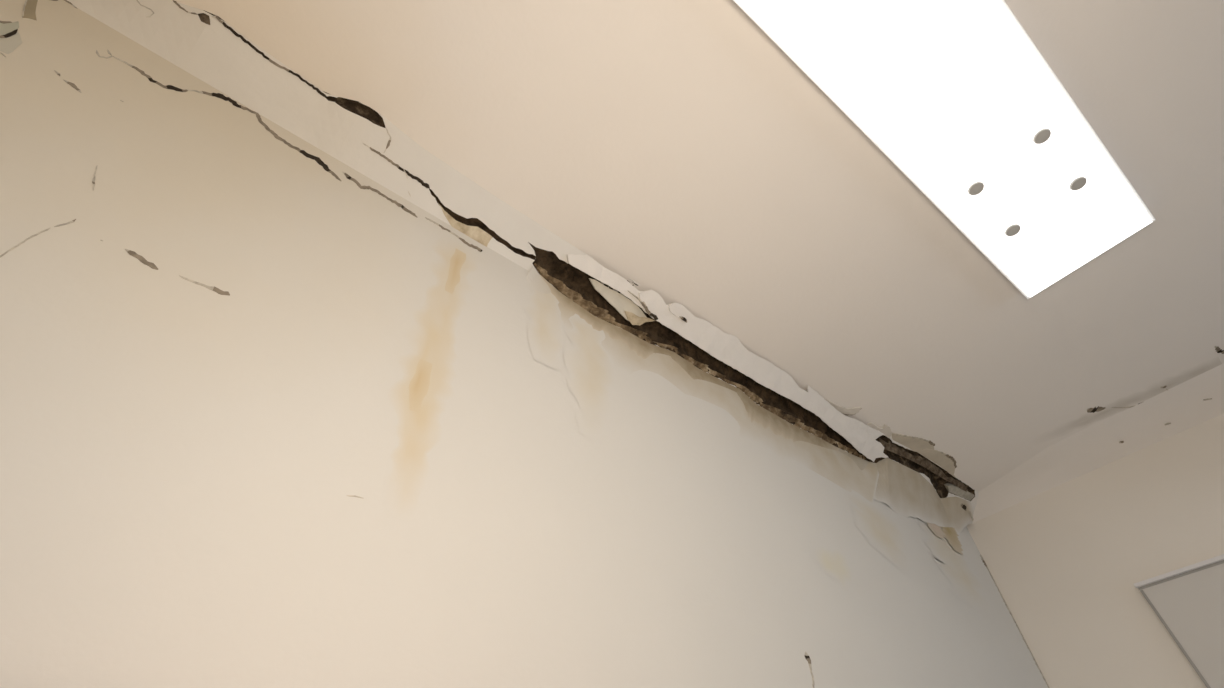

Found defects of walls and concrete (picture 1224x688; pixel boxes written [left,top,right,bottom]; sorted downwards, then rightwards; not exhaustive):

peeling [0,0,58,57]
crack [0,219,76,258]
crack [101,240,230,296]
water stain [384,227,487,522]
flaking render [429,189,975,521]
water stain [524,266,993,618]